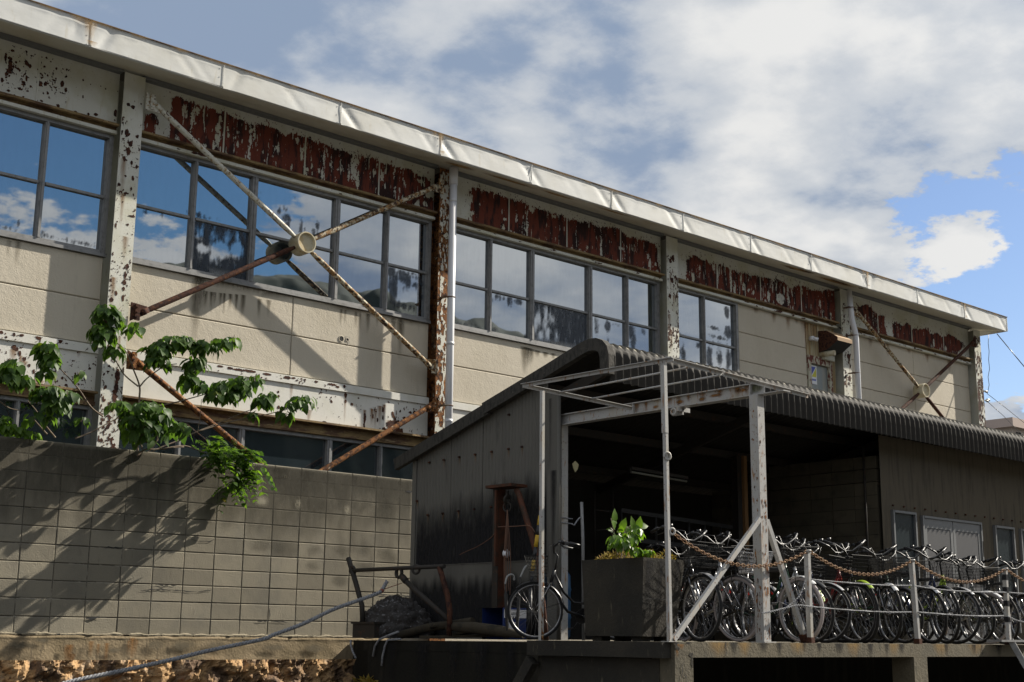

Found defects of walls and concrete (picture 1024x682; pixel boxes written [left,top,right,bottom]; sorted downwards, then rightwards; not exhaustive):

rust [1,45,71,107]
rust [0,95,434,448]